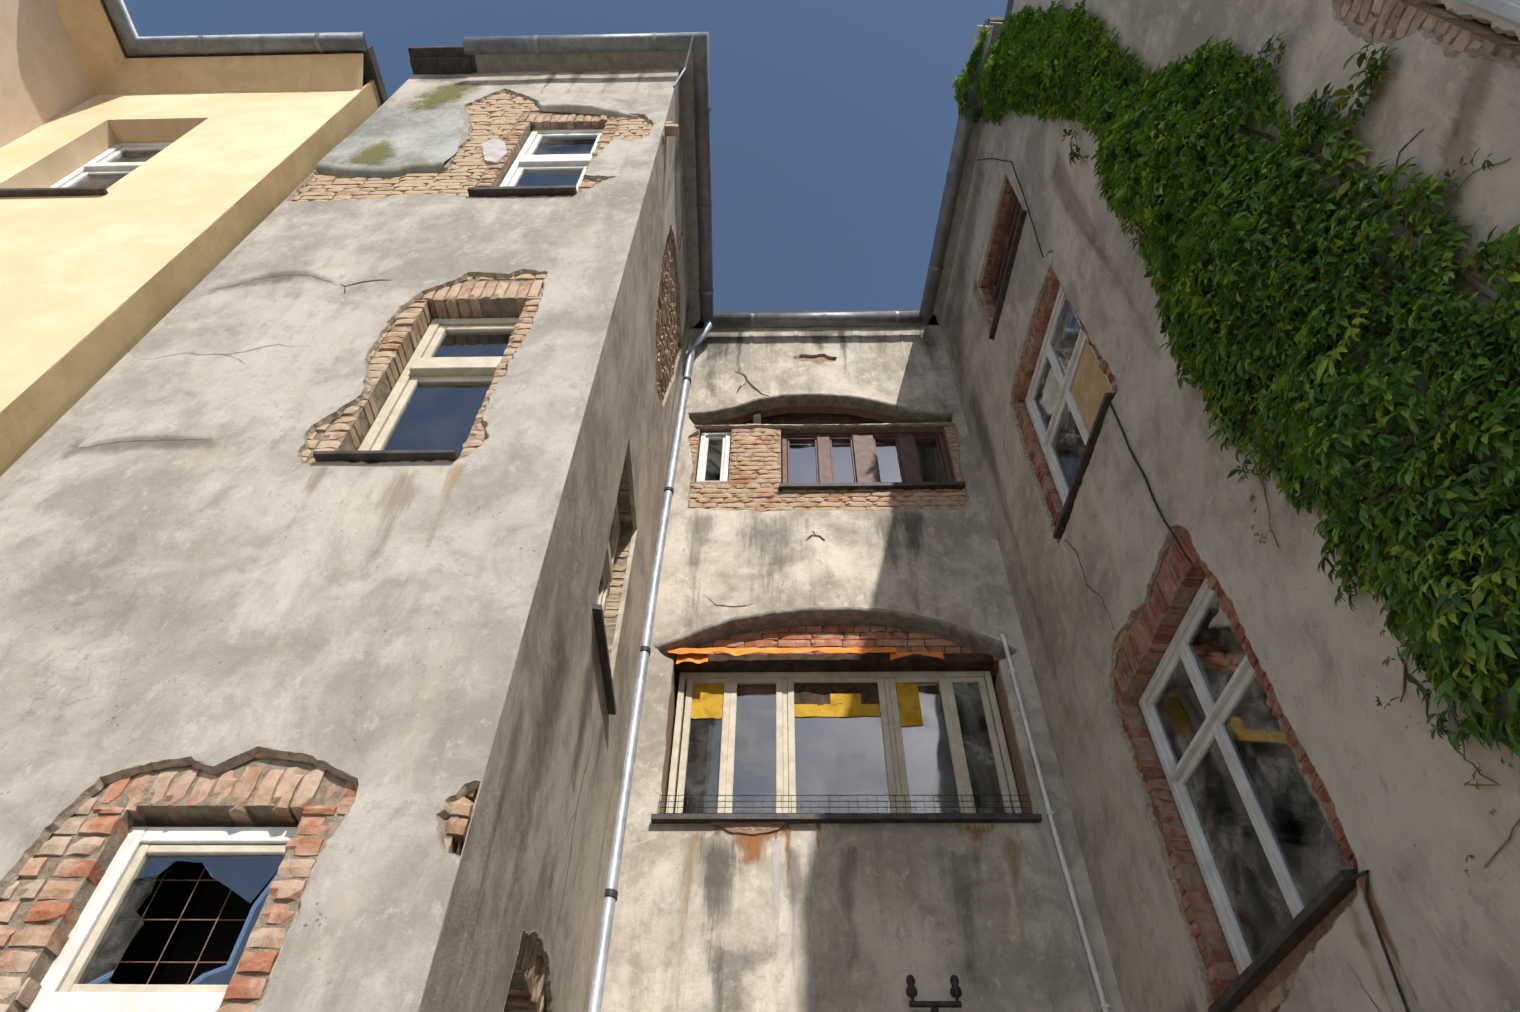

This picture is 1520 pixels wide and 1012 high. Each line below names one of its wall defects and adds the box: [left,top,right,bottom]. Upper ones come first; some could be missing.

flaking render [1332,0,1520,72]
leakage [412,82,480,111]
leakage [350,141,393,164]
flaking render [285,88,679,202]
crack [341,279,387,293]
flaking render [655,224,682,409]
flaking render [297,269,548,465]
flaking render [1109,524,1359,1012]
flaking render [0,745,360,1012]
flaking render [436,779,483,859]
leakage [686,844,729,913]
rust [715,826,790,863]